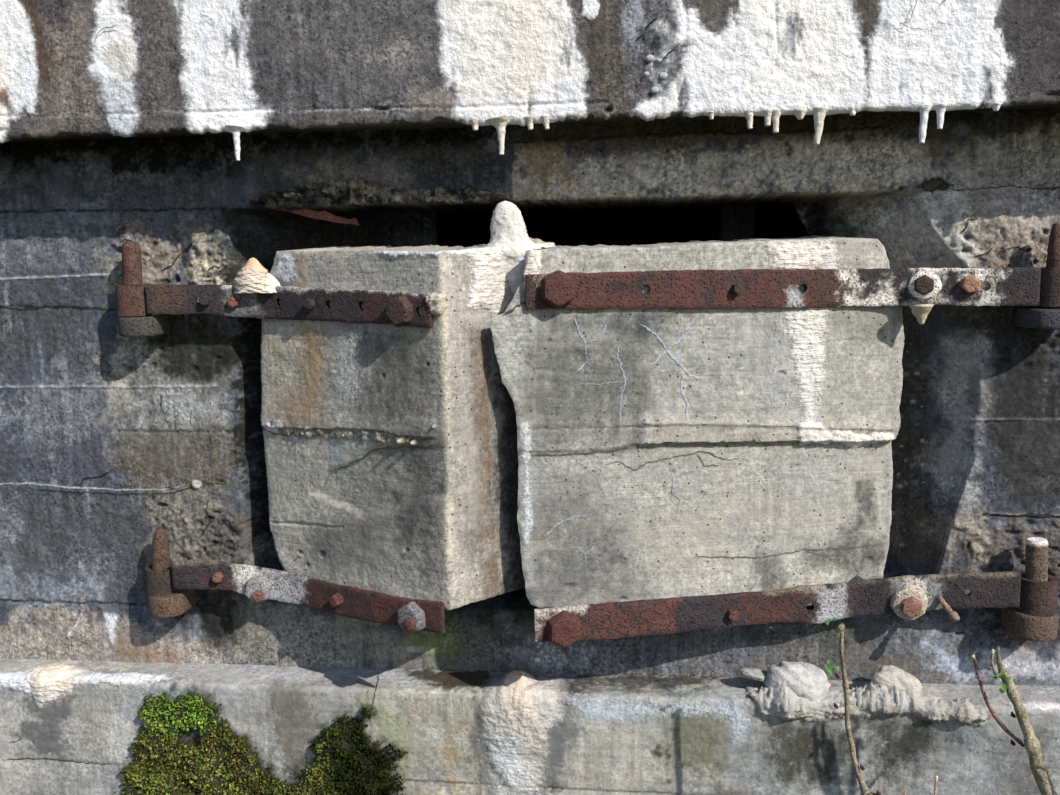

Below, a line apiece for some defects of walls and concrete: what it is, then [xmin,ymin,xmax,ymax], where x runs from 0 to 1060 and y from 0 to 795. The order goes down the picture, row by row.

damp [0,0,47,143]
damp [87,0,139,137]
damp [174,0,272,161]
damp [436,0,588,155]
damp [634,0,1014,145]
spalling [255,178,508,211]
crack [574,318,626,421]
crack [640,324,704,422]
crack [263,428,436,486]
crack [544,488,600,536]
crack [531,445,748,508]
damp [531,674,718,795]